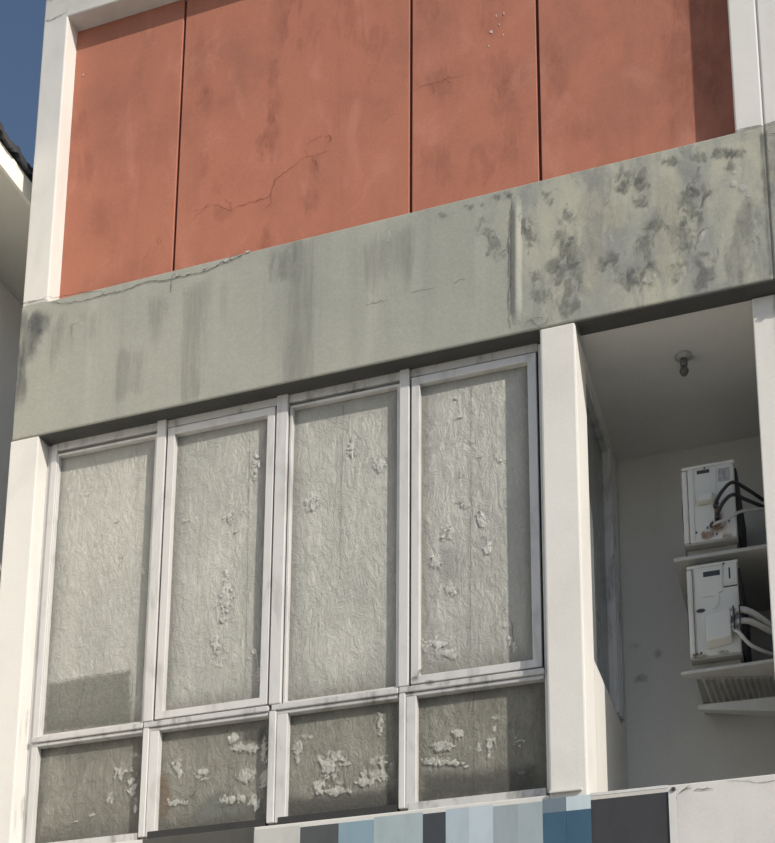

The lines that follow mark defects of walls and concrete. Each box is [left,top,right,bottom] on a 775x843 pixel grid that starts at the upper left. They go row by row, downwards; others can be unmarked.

crack [507,195,548,328]
crack [20,254,241,339]
peeling [114,765,138,813]
peeling [171,754,183,779]
peeling [194,766,209,781]
peeling [219,729,268,812]
peeling [291,735,313,764]
peeling [310,750,393,799]
peeling [422,728,470,768]
peeling [476,717,497,758]